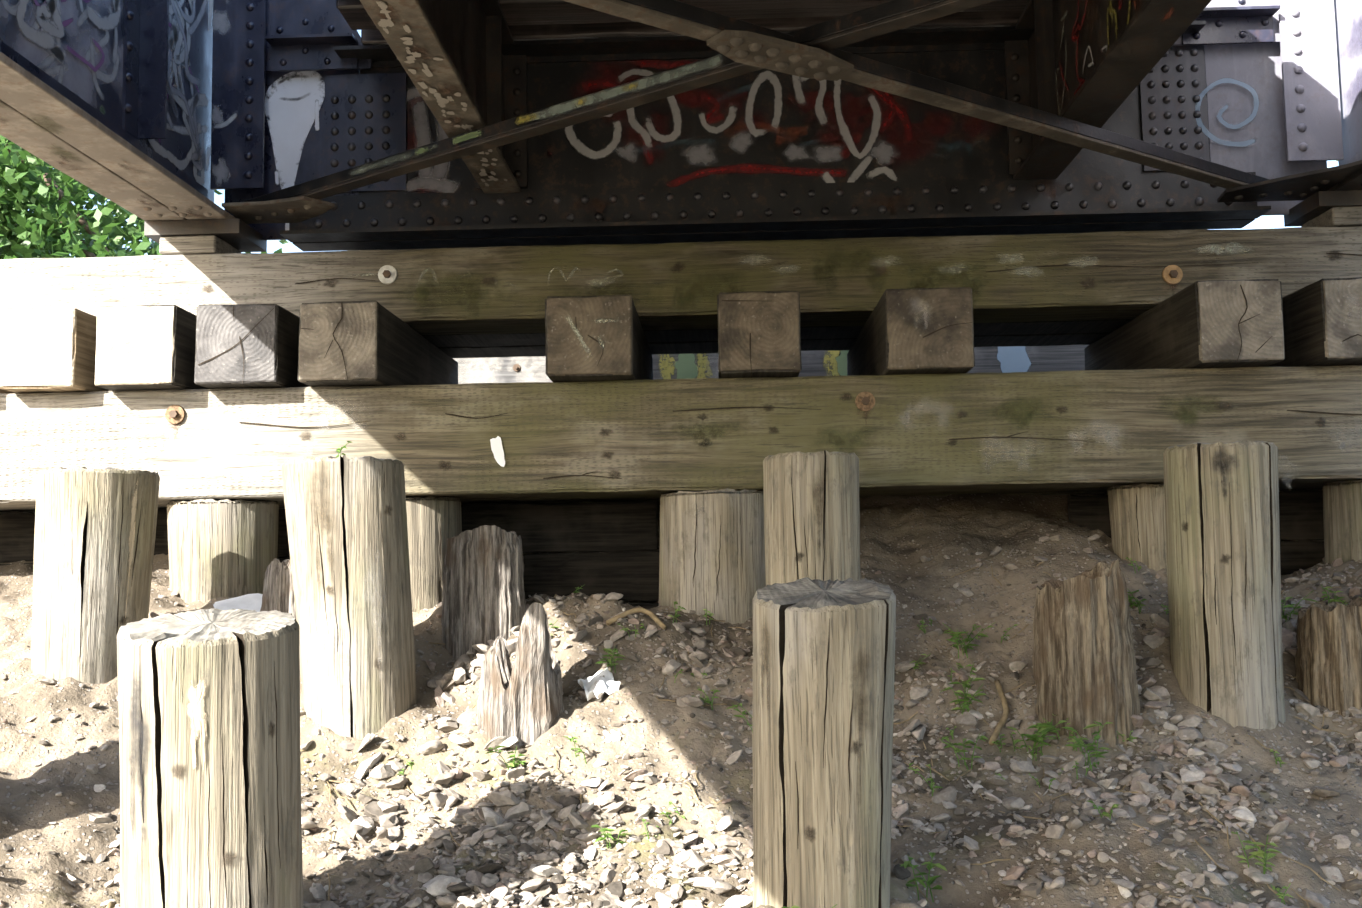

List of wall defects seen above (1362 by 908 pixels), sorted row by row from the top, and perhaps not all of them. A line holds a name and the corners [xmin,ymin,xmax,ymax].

peeling [376,1,473,131]
peeling [478,149,508,187]
crack [198,306,274,384]
crack [295,278,375,380]
crack [987,258,1272,361]
crack [1287,408,1362,416]
crack [239,421,369,736]
crack [1197,442,1278,714]
crack [779,450,889,908]
crack [139,637,171,908]
crack [208,632,281,908]